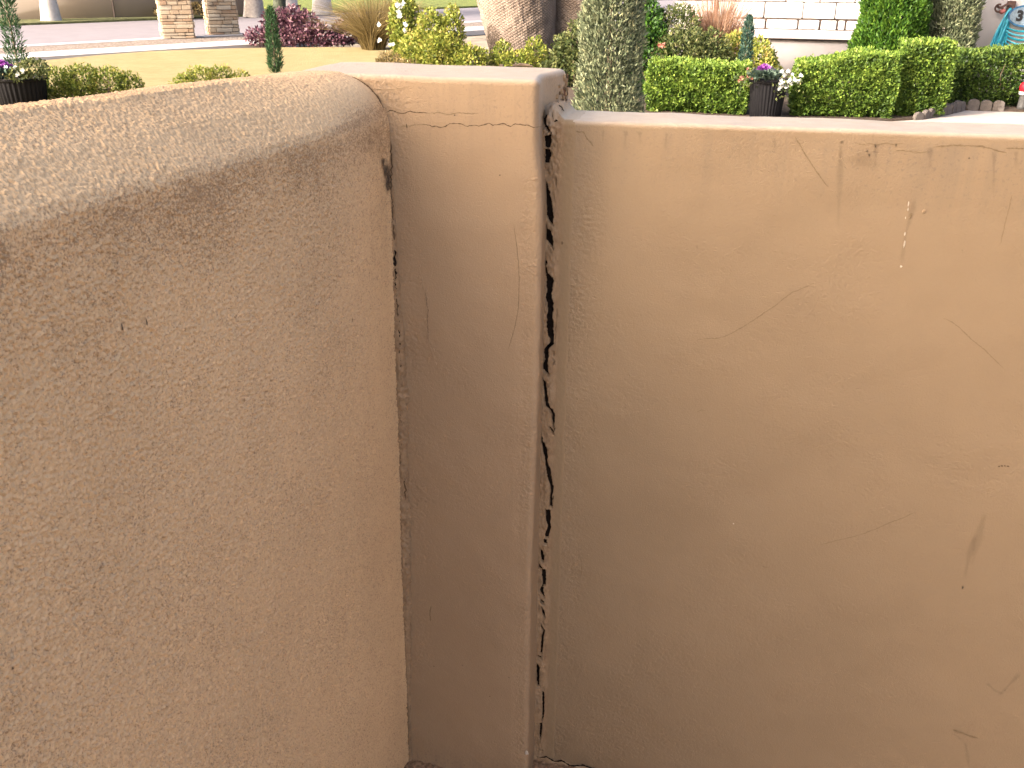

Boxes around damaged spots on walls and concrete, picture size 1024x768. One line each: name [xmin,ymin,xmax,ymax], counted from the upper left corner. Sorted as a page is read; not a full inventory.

crack [353,77,593,768]